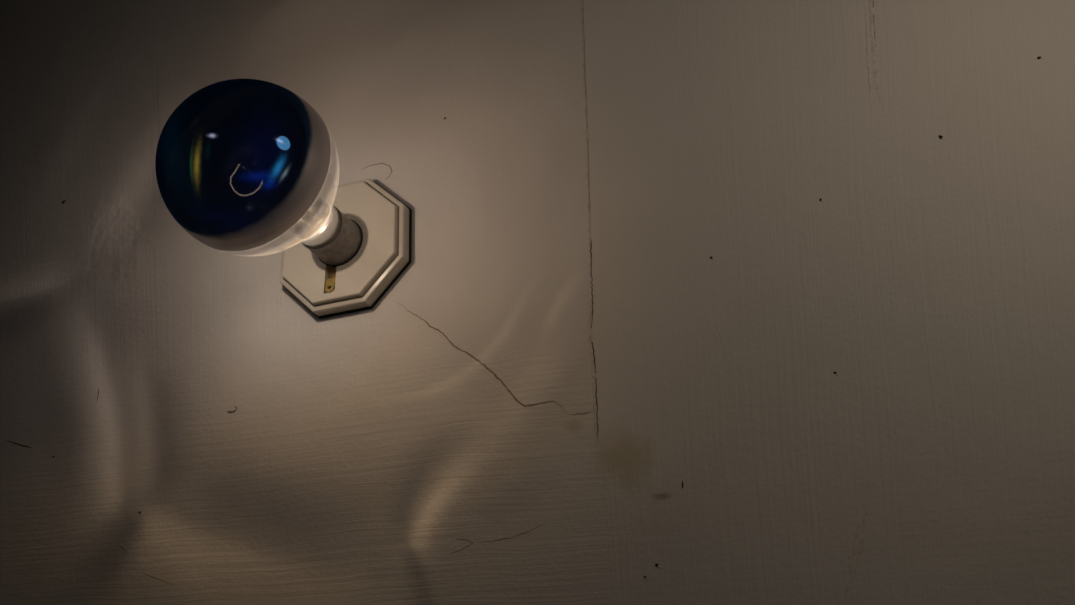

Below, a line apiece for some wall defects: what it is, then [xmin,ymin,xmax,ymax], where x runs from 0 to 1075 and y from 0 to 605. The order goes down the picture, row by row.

crack [394,0,599,444]